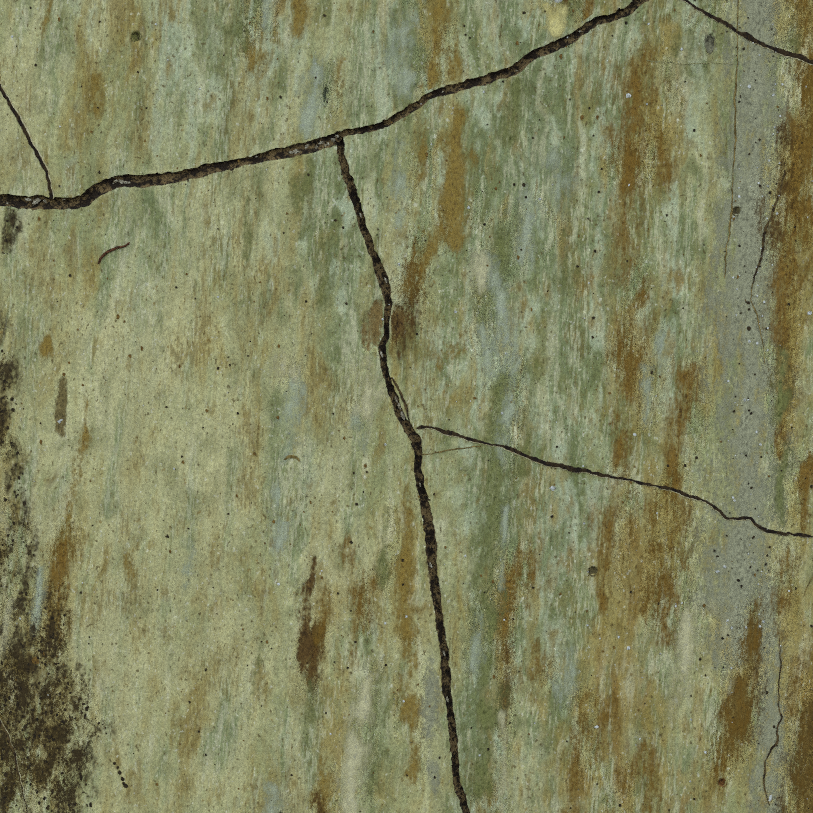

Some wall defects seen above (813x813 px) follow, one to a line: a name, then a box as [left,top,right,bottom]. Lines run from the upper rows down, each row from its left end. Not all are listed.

mould [2,208,22,254]
crack [0,0,655,319]
corrosion [608,42,675,287]
crack [647,0,813,278]
corrosion [759,0,813,461]
crack [0,719,28,813]
water stain [0,310,113,813]
crack [335,138,813,813]
corrosion [588,481,632,611]
corrosion [630,363,699,646]
corrosion [713,599,767,790]
corrosion [780,653,813,813]